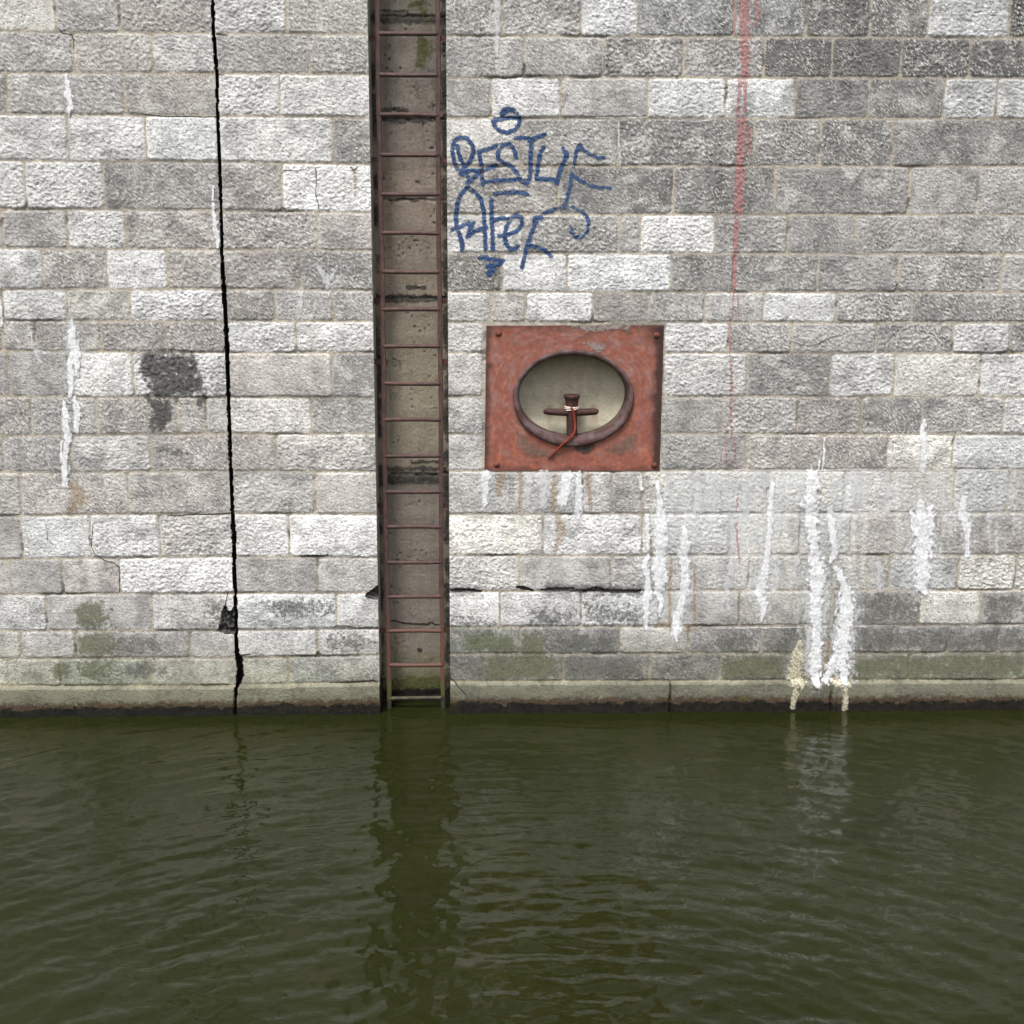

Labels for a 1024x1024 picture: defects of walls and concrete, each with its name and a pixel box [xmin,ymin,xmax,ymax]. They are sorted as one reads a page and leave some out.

leakage [58,316,86,488]
crack [141,0,251,703]
spalling [217,604,238,634]
leakage [371,53,449,544]
leakage [444,78,1024,714]